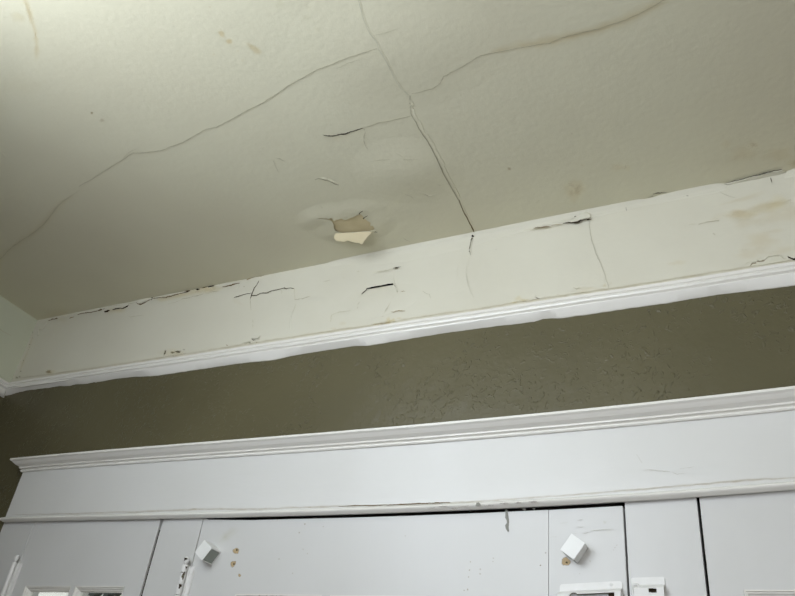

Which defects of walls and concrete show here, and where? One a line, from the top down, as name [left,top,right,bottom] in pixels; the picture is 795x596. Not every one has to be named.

crack [4,0,664,294]
crack [35,276,309,336]